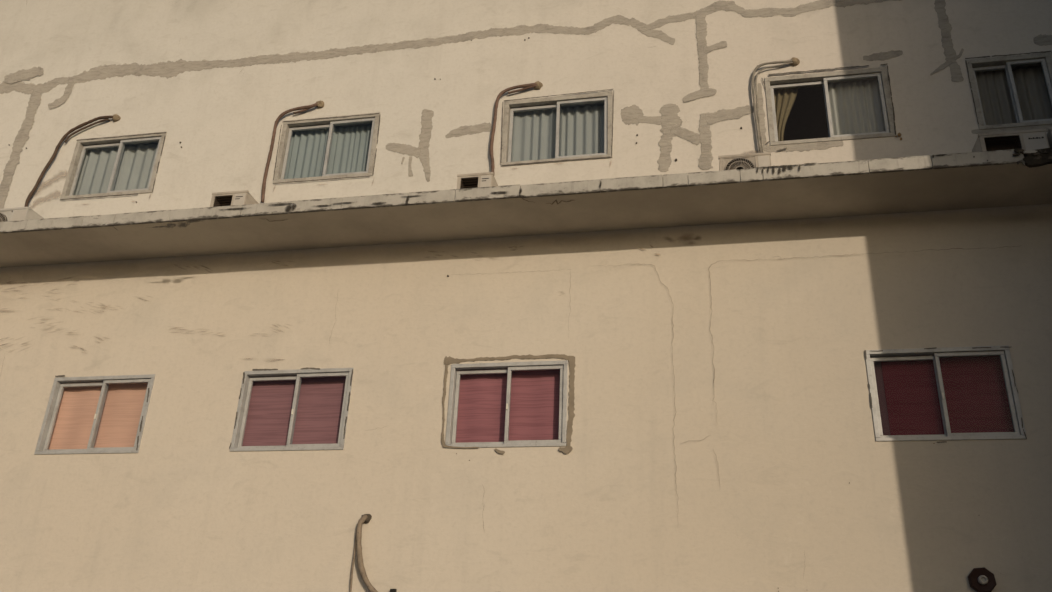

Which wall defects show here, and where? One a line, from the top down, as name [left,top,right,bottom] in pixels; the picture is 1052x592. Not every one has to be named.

spalling [1012,147,1052,168]